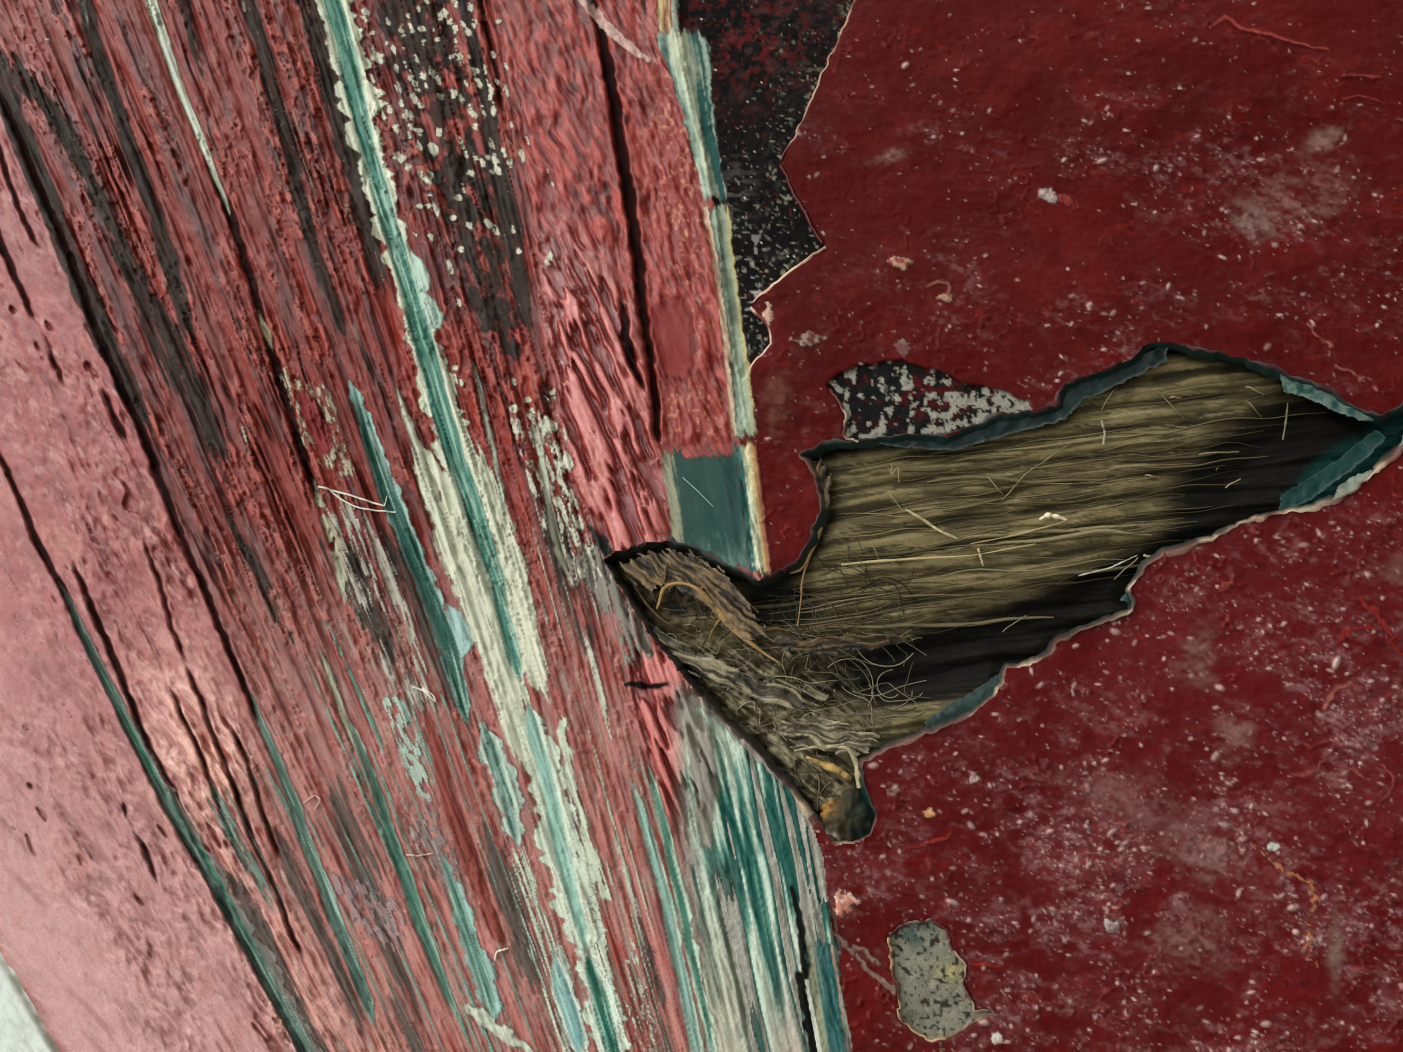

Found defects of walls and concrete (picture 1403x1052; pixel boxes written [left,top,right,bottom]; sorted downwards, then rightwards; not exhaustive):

crack [589,0,660,442]
peeling [649,296,693,382]
peeling [678,0,857,371]
crack [0,92,318,956]
peeling [314,482,462,889]
peeling [413,419,549,772]
spalling [515,338,1403,845]
peeling [330,872,404,956]
peeling [510,717,657,1052]
peeling [807,940,849,1052]
peeling [887,917,1002,1044]